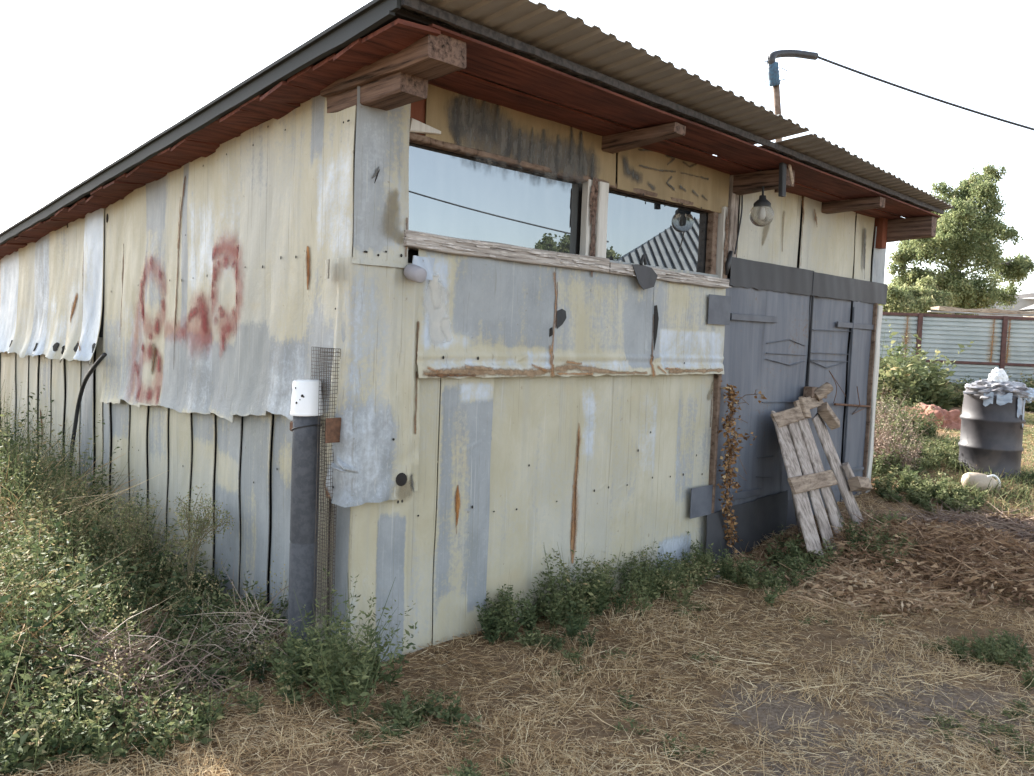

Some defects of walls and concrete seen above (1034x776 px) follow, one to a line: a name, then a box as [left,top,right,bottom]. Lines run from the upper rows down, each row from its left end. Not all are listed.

damp [448,94,597,183]
rust [414,273,723,434]
rust [570,426,580,563]